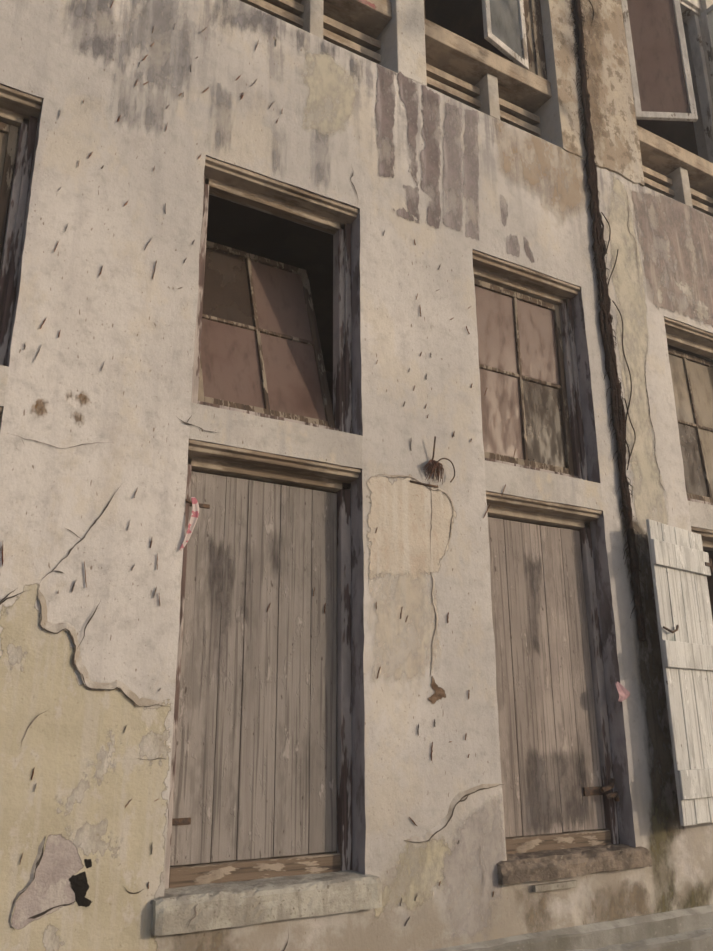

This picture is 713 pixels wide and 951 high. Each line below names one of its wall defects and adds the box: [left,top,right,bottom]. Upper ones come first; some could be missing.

leakage [70,0,190,90]
leakage [216,0,277,35]
rust [35,400,46,415]
crack [0,482,170,707]
peeling [366,474,456,704]
peeling [0,583,171,951]
crack [407,784,504,843]